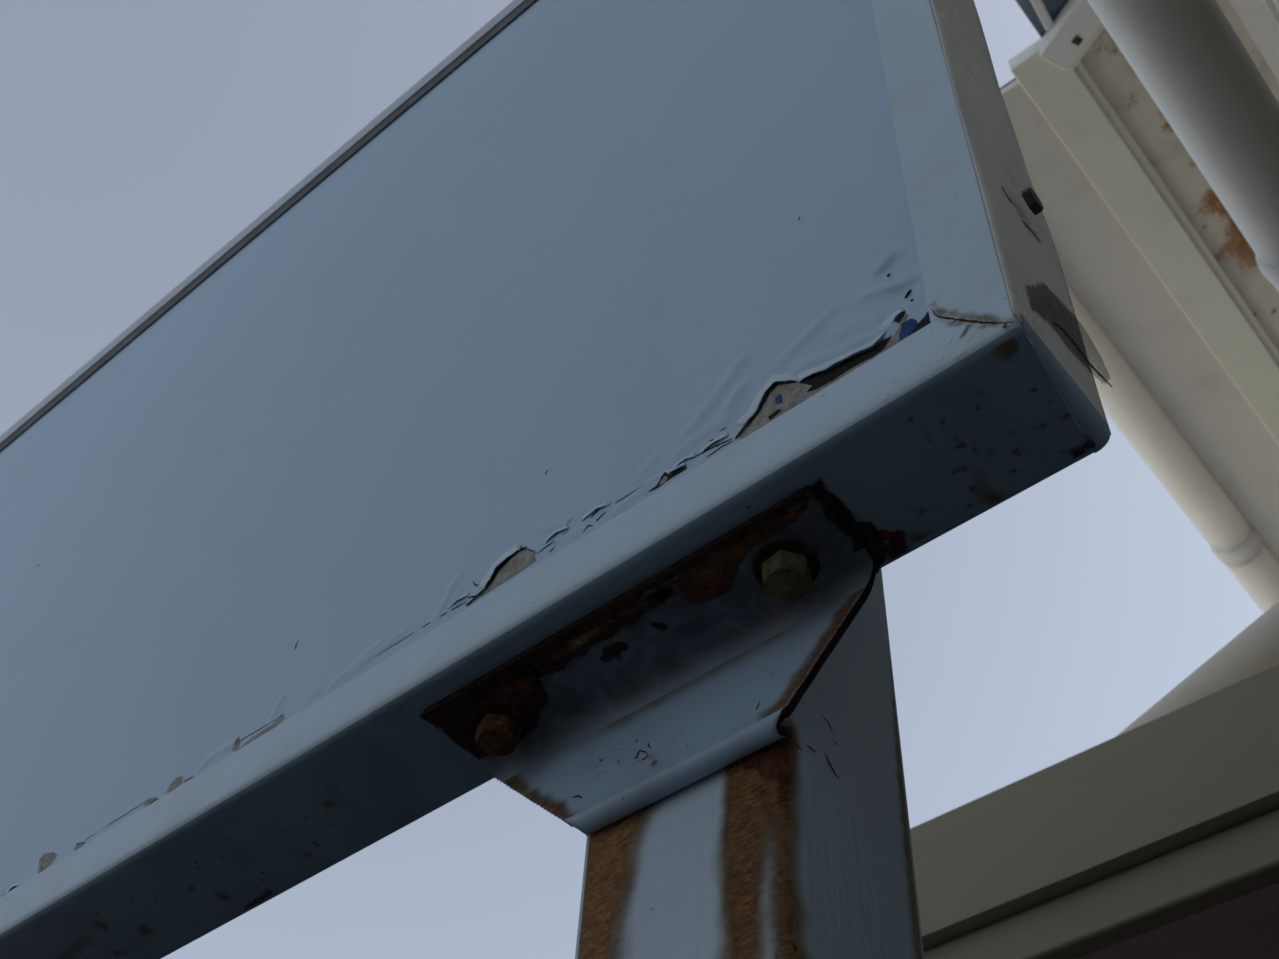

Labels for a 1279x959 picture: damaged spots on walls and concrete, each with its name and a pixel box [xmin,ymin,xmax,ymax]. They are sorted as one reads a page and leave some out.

corrosion [1200,190,1257,269]
corrosion [1053,321,1113,387]
peeling [648,307,918,492]
corrosion [1069,436,1097,458]
corrosion [967,487,1002,507]
peeling [447,502,608,609]
corrosion [420,480,927,759]
peeling [232,714,284,751]
peeling [143,776,194,806]
corrosion [721,588,864,959]
peeling [38,852,57,873]
corrosion [578,804,652,959]